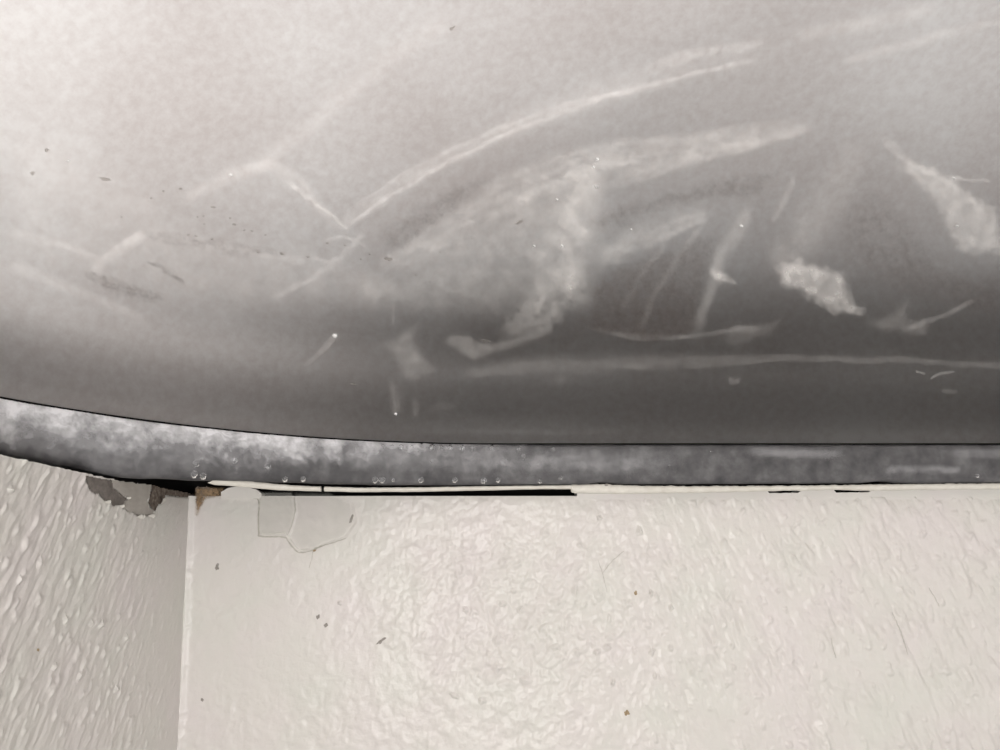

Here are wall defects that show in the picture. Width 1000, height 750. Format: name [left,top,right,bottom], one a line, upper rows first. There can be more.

peeling [86,476,194,519]